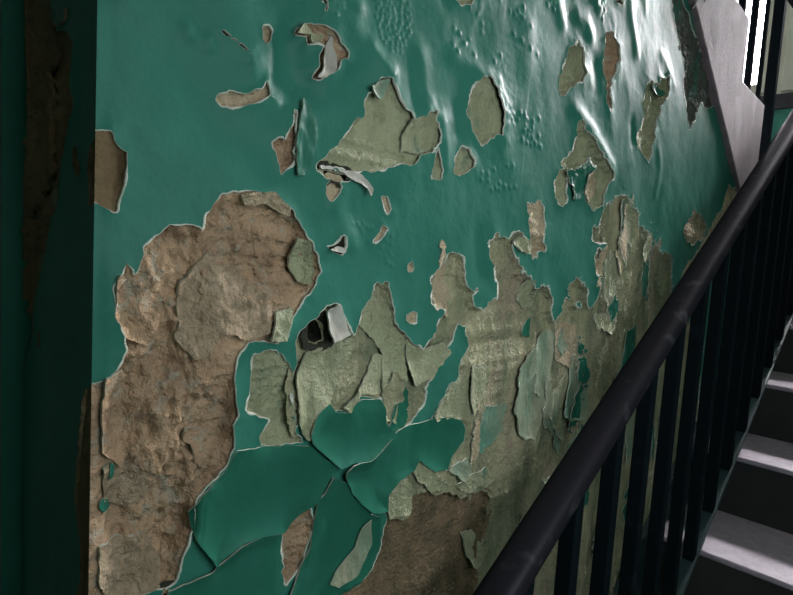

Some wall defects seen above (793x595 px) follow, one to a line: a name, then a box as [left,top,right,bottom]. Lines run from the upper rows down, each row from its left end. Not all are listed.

peeling [294,22,350,81]
peeling [271,76,477,202]
peeling [466,74,506,146]
peeling [559,39,588,97]
peeling [602,31,622,113]
peeling [636,75,671,162]
flaking render [21,0,73,379]
peeling [74,119,674,595]
peeling [671,321,690,468]